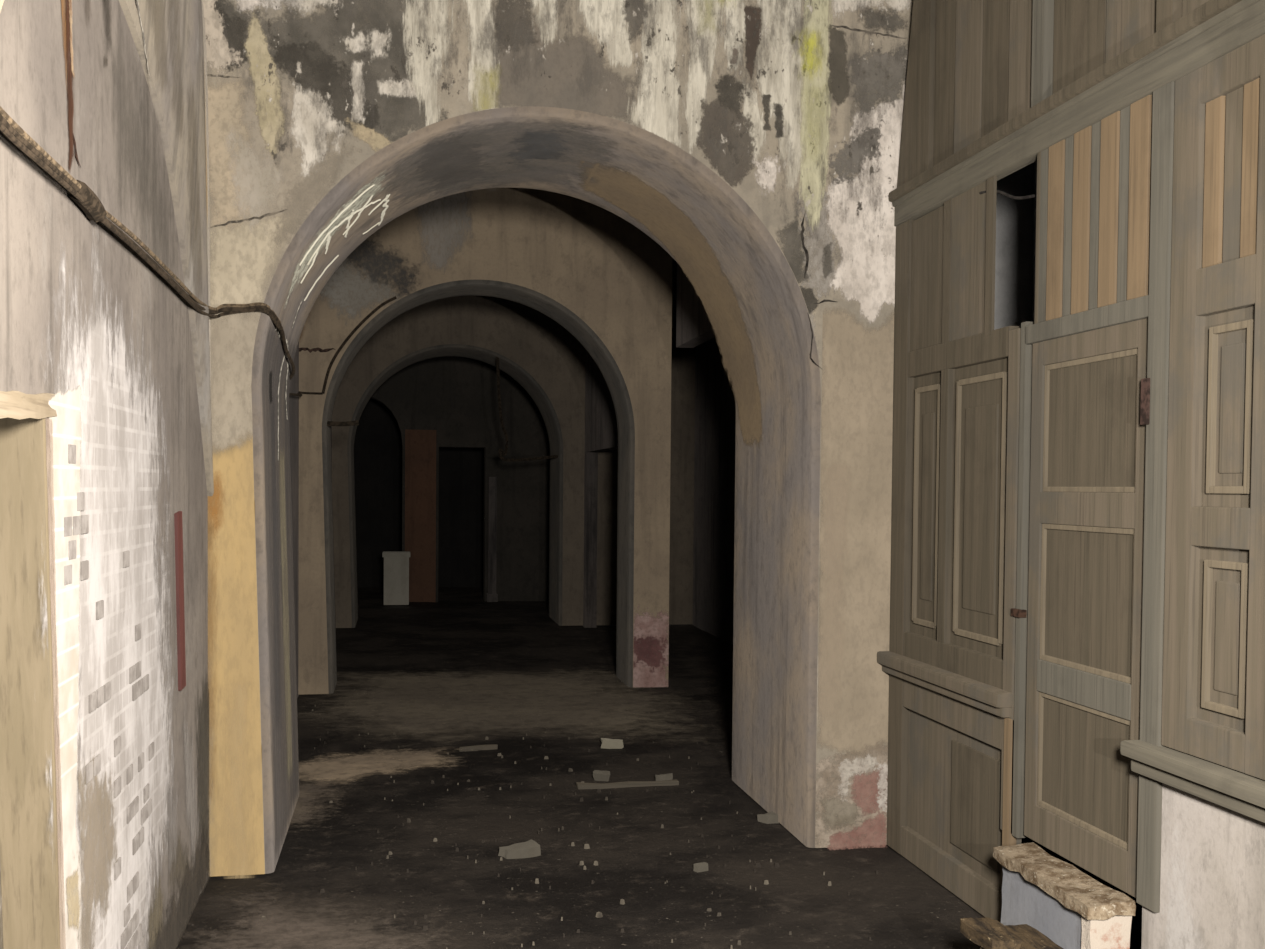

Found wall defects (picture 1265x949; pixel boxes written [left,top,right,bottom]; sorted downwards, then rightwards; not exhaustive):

corrosion [61,0,81,170]
peeling [202,0,447,227]
damp [403,0,500,126]
damp [532,0,558,44]
peeling [485,0,684,120]
damp [579,0,832,231]
peeling [696,0,910,369]
crack [829,24,901,38]
peeling [43,251,173,949]
damp [78,760,117,949]